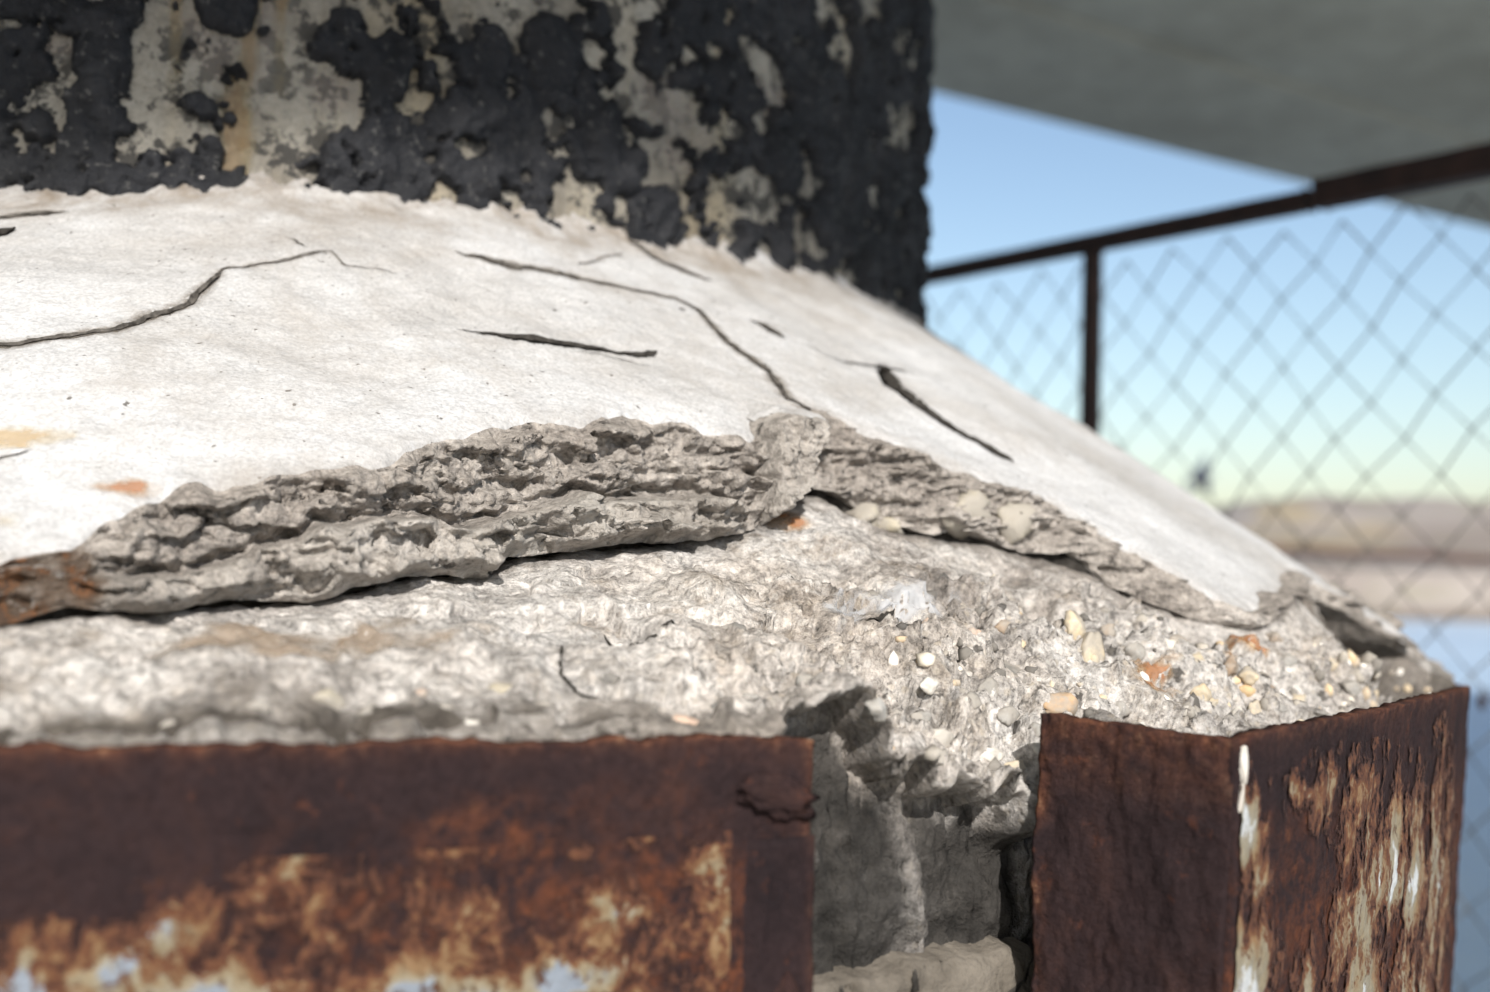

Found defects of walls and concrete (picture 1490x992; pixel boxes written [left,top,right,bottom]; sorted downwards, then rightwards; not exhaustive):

spalling [0,227,16,237]
crack [0,210,64,219]
crack [0,237,393,349]
crack [454,235,811,410]
spalling [0,415,774,621]
rust [0,549,103,626]
spalling [791,405,1432,789]
spalling [311,688,380,717]
rust [1142,662,1169,690]
peeling [1234,710,1457,992]
crack [911,969,919,992]
crack [1008,957,1033,992]